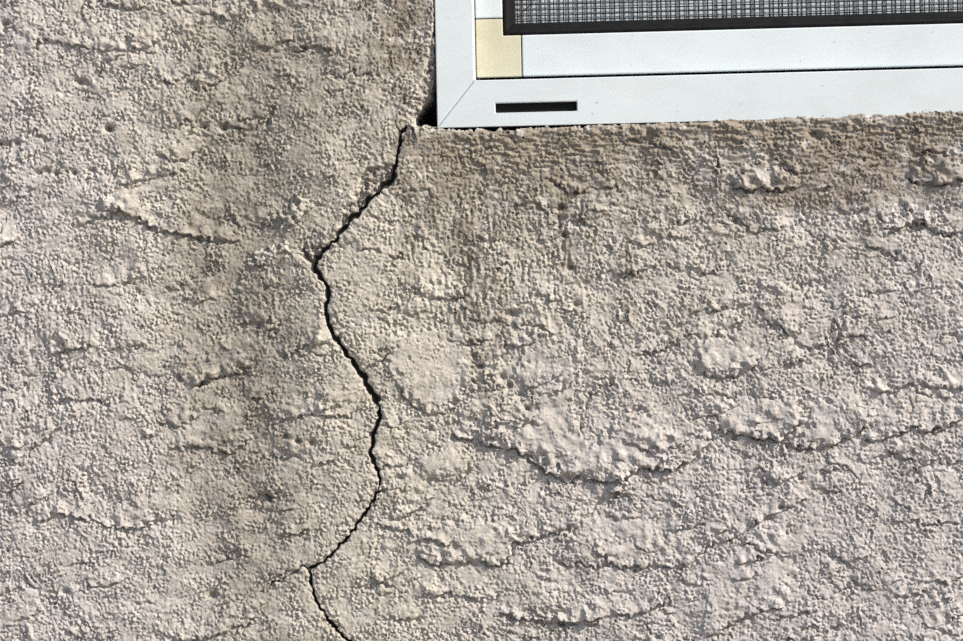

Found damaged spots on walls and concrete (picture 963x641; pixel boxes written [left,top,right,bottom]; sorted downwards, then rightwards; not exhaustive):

crack [260,126,407,641]